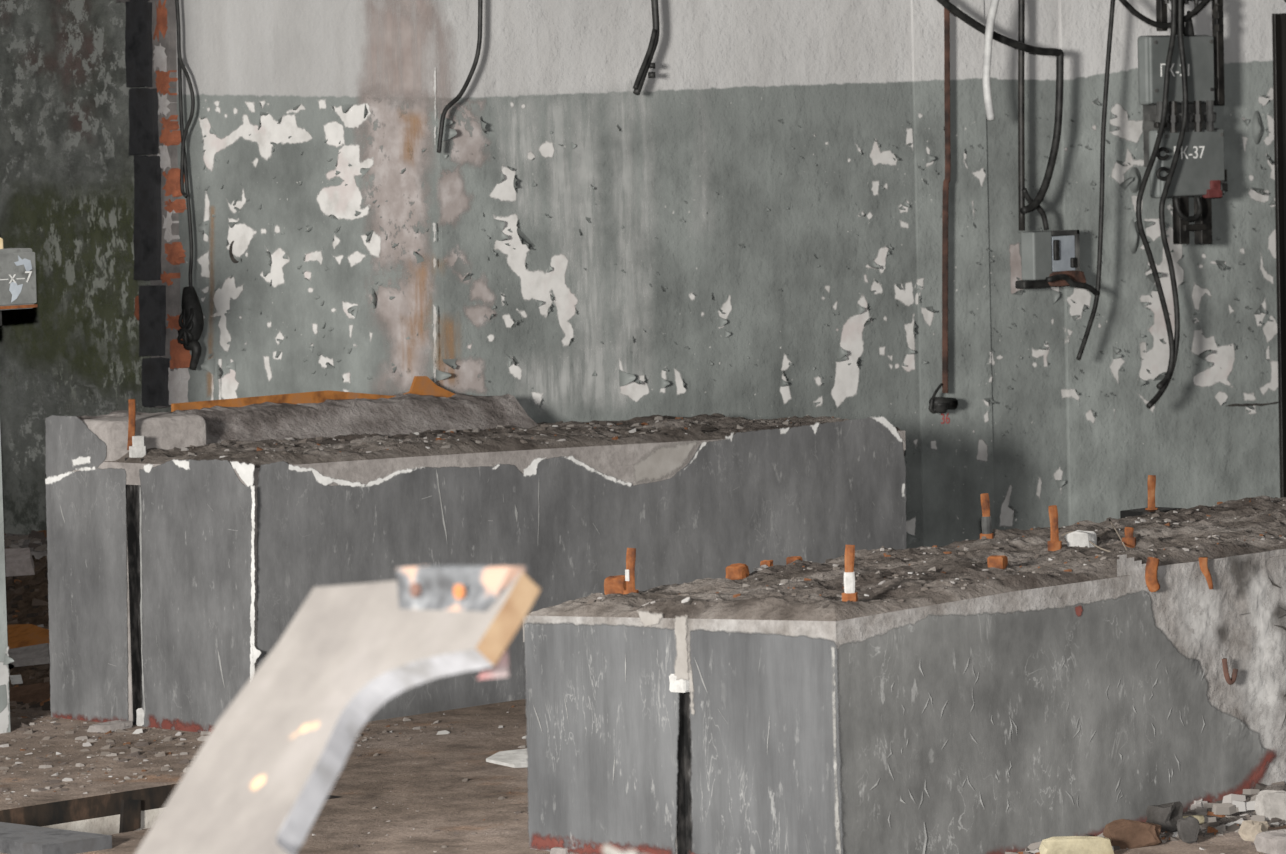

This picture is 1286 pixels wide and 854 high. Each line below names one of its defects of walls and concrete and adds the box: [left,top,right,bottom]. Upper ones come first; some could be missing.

water stain [363,0,447,101]
water stain [0,0,142,467]
peeling [191,67,578,400]
peeling [812,244,950,407]
peeling [506,355,543,416]
flaking render [289,464,422,487]
flaking render [524,457,547,477]
spalling [567,441,706,487]
corrosion [1145,557,1160,592]
corrosion [1199,557,1213,589]
peeling [0,647,14,734]
spalling [1117,549,1286,786]